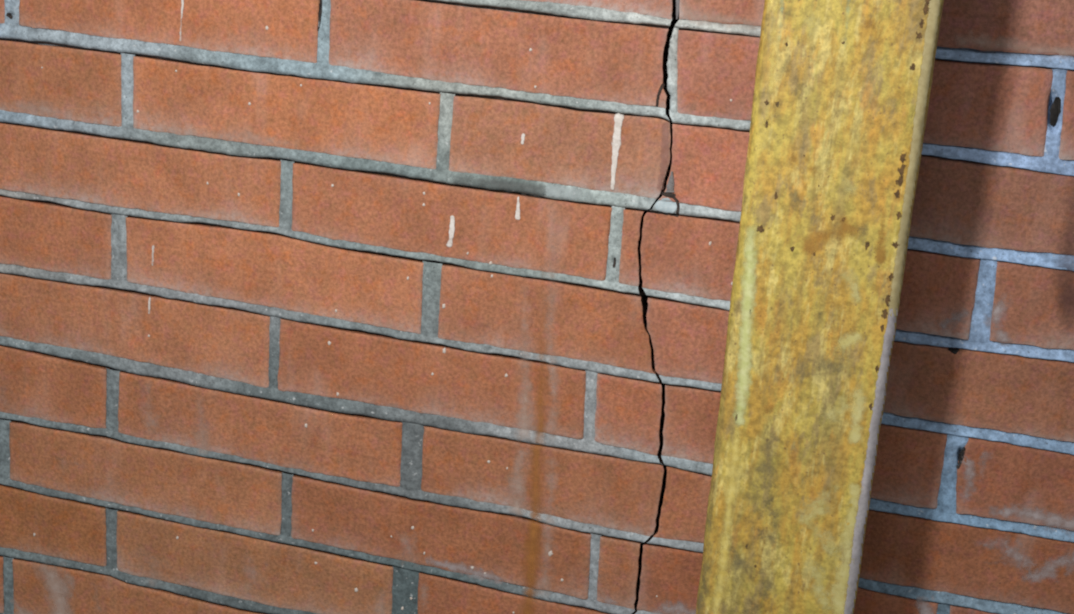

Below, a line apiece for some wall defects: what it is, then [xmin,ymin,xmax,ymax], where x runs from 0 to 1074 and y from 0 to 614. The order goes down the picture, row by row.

damp [611,113,624,190]
crack [632,0,680,614]